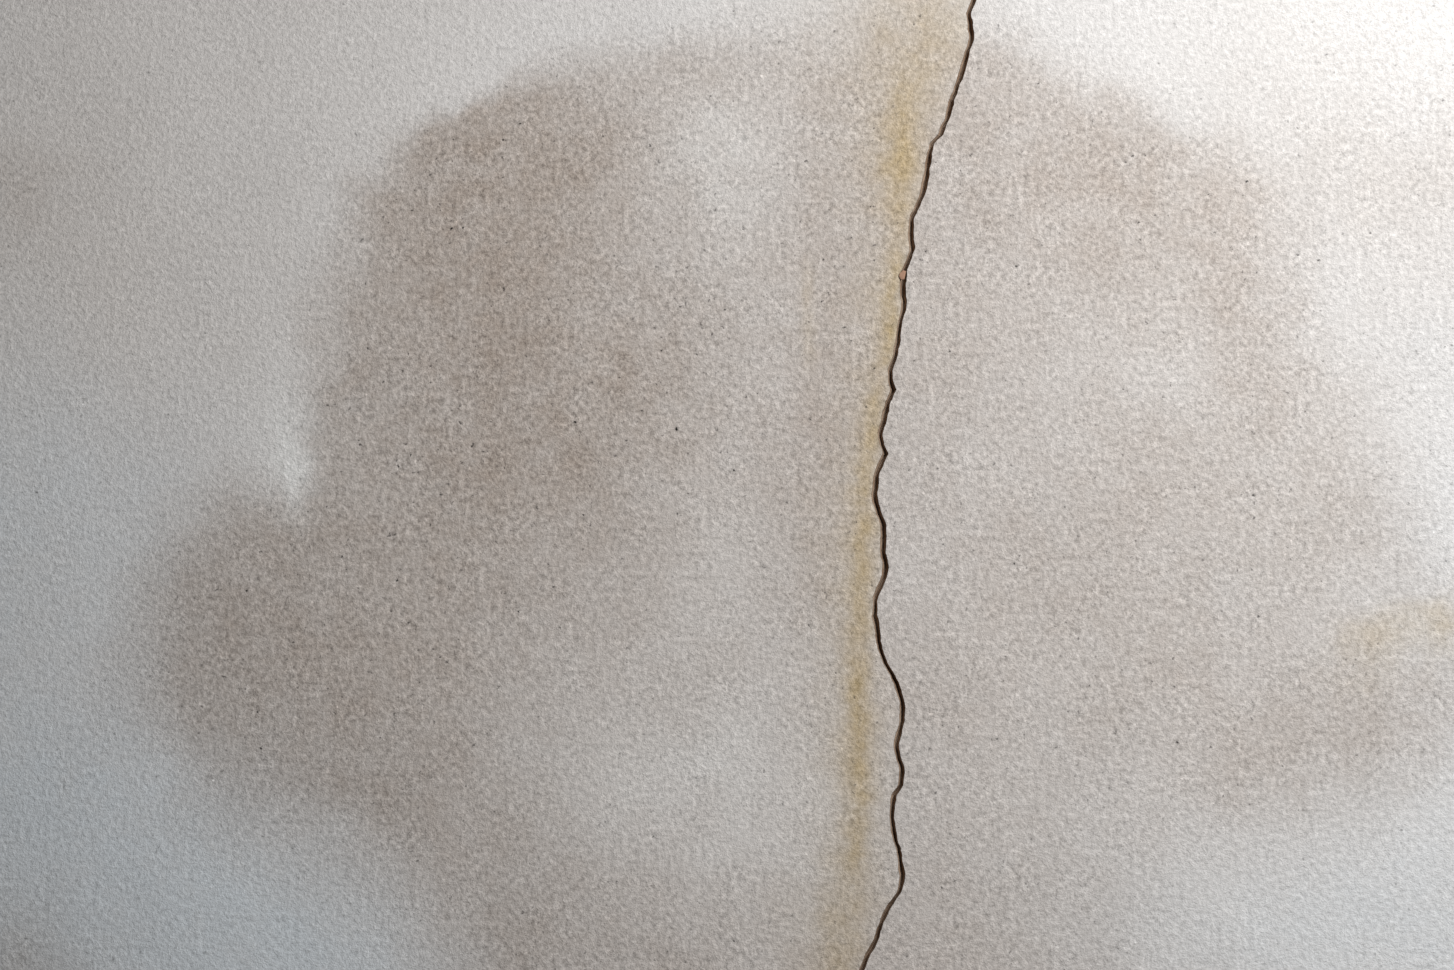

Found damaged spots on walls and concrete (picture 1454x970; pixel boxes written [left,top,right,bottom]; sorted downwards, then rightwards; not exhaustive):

water stain [63,0,838,970]
rust [749,0,971,970]
crack [859,0,976,970]
water stain [865,0,1454,970]